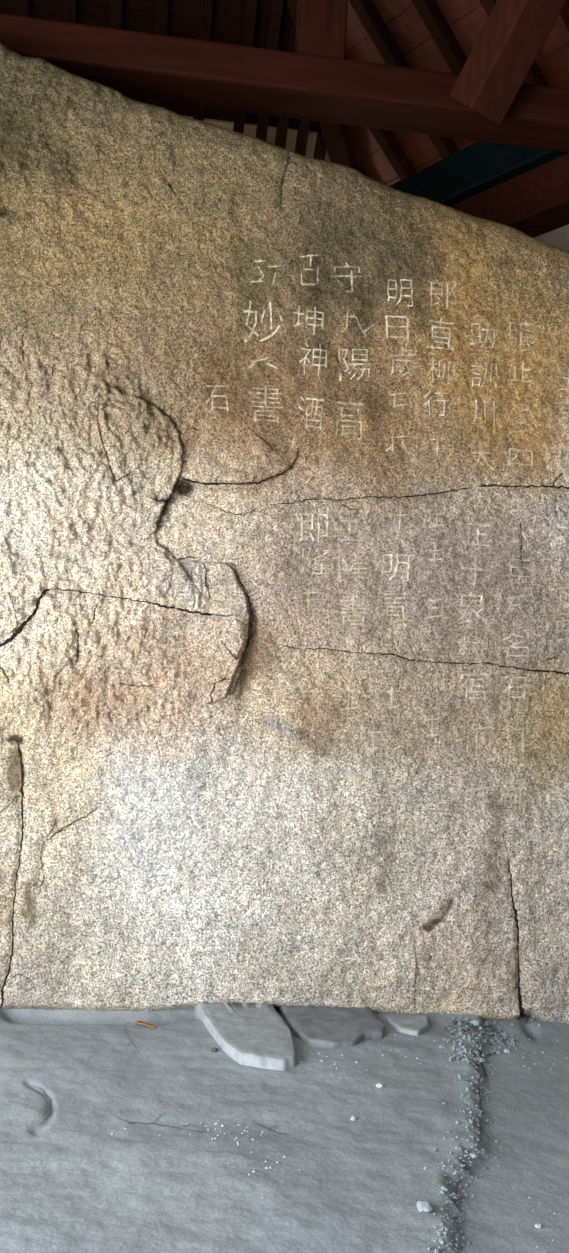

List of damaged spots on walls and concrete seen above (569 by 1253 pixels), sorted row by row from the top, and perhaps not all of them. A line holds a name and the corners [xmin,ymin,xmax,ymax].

crack [0,386,569,704]
crack [0,738,99,1008]
crack [455,830,524,1202]